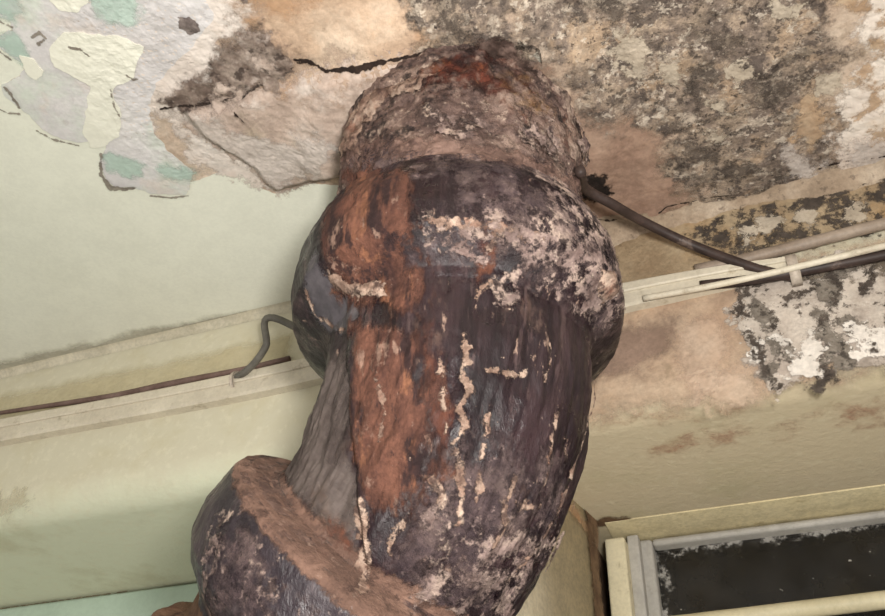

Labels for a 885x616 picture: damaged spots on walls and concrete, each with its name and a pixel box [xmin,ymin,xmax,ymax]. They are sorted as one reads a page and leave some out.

peeling [0,0,350,199]
crack [160,52,422,123]
corrosion [415,43,511,95]
flaking render [416,8,593,113]
flaking render [586,98,681,162]
water stain [234,0,885,422]
corrosion [320,164,456,597]
peeling [722,263,885,401]